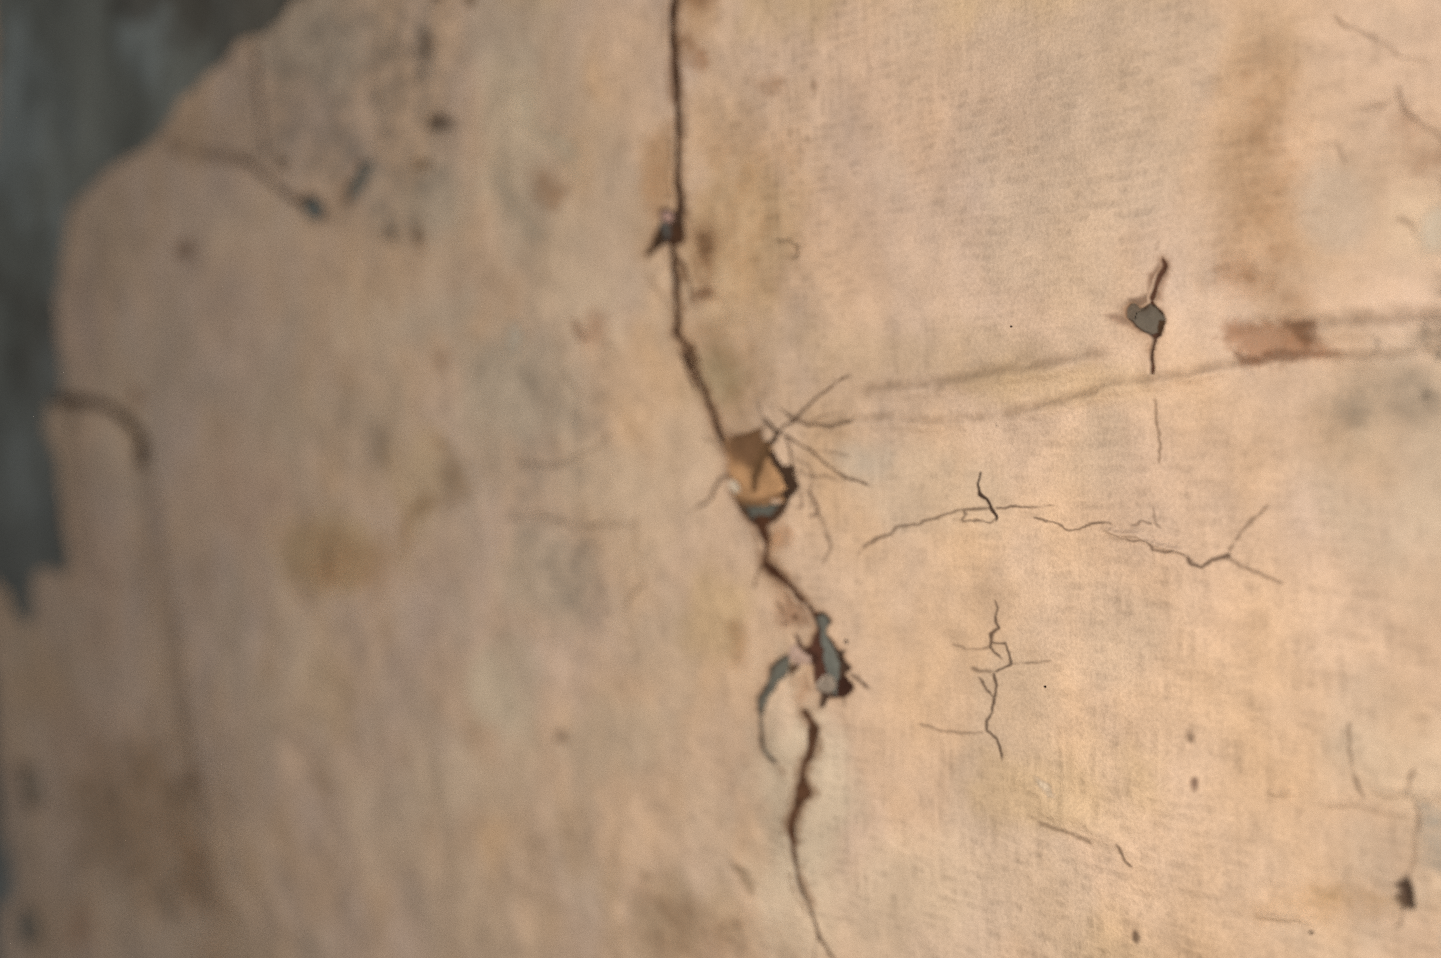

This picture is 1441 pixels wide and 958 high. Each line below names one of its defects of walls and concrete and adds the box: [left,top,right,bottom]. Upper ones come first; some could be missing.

crack [664,0,730,506]
peeling [0,0,291,625]
crack [765,377,868,485]
crack [751,504,822,617]
crack [870,472,1017,543]
crack [1150,546,1229,568]
crack [981,617,1011,757]
crack [788,709,834,958]
crack [1396,879,1414,908]